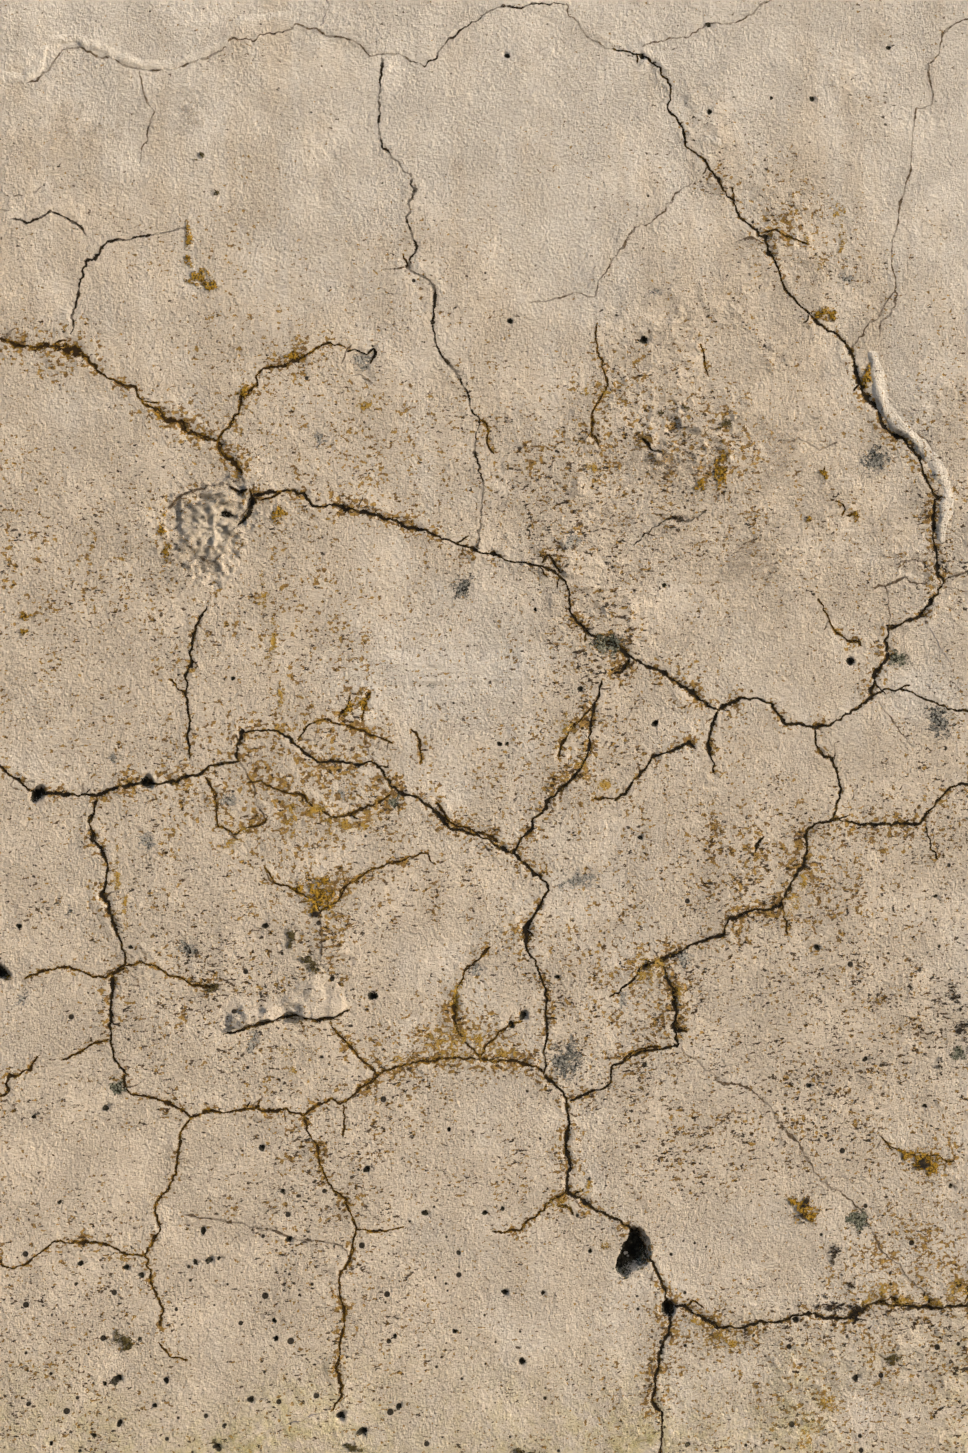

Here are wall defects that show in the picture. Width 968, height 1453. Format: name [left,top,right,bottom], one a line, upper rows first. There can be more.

crack [17,46,190,163]
crack [405,2,576,68]
crack [0,210,352,474]
crack [220,14,968,998]
crack [168,606,207,759]
crack [0,679,968,1453]